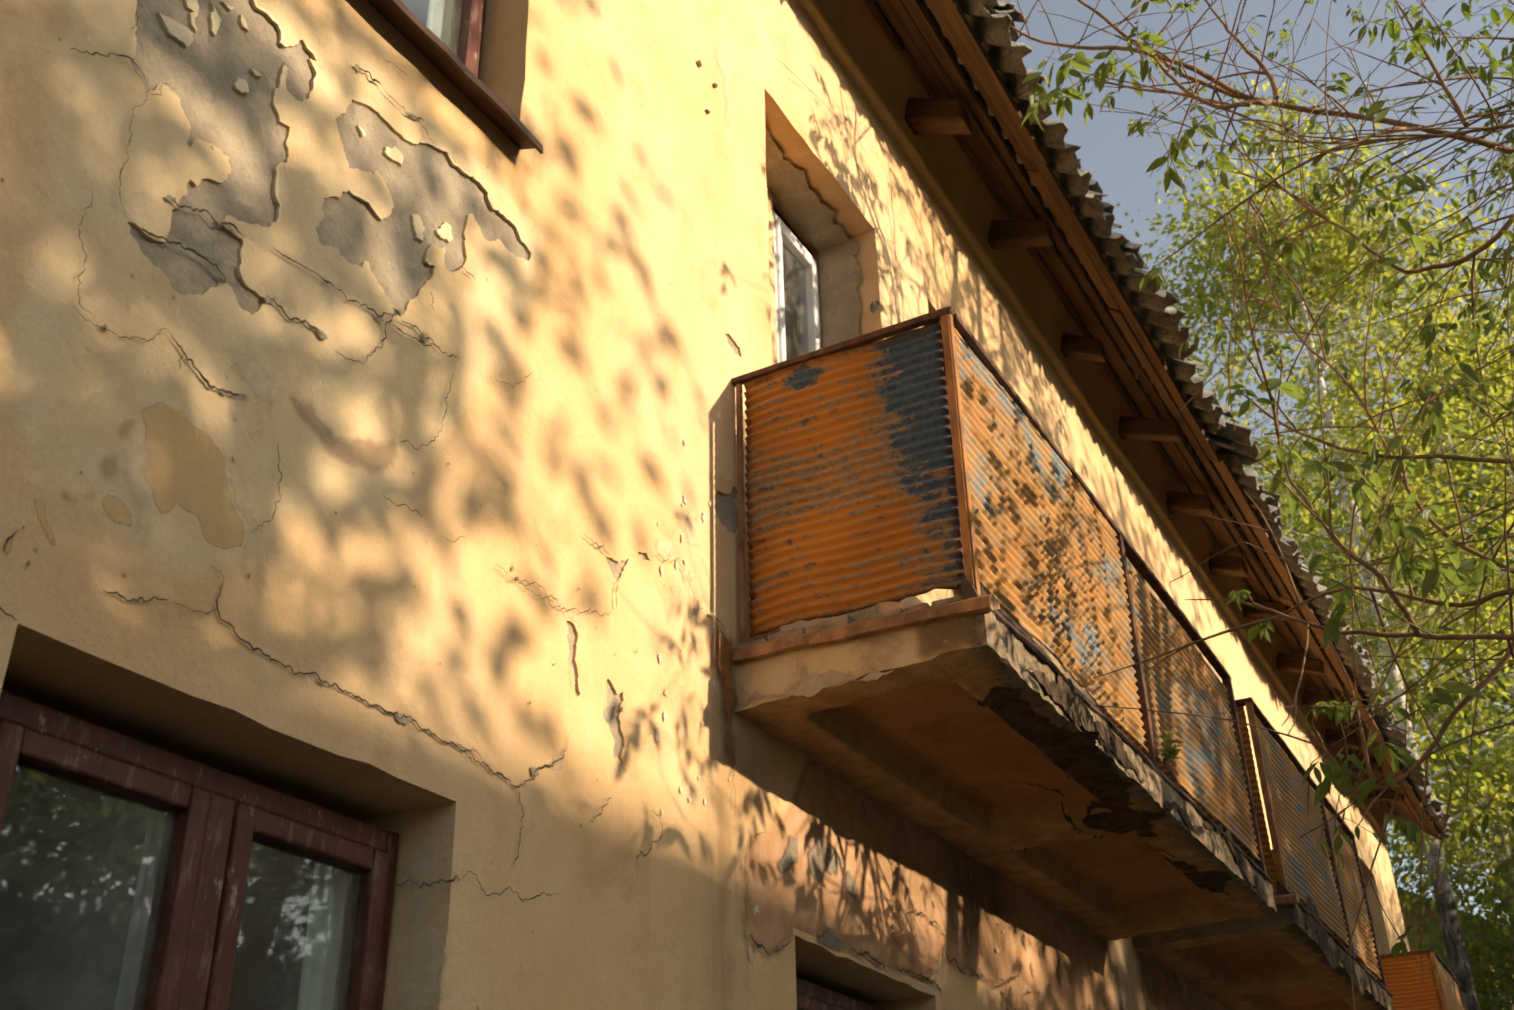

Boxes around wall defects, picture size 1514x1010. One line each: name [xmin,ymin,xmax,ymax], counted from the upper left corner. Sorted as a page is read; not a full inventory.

peeling [129,0,319,315]
crack [69,0,475,450]
peeling [315,102,532,310]
crack [249,441,282,533]
crack [383,495,465,542]
crack [495,533,619,617]
peeling [607,534,705,592]
peeling [554,621,577,697]
crack [103,565,569,902]
peeling [597,681,626,782]
crack [636,811,663,867]
flaking render [778,835,859,903]